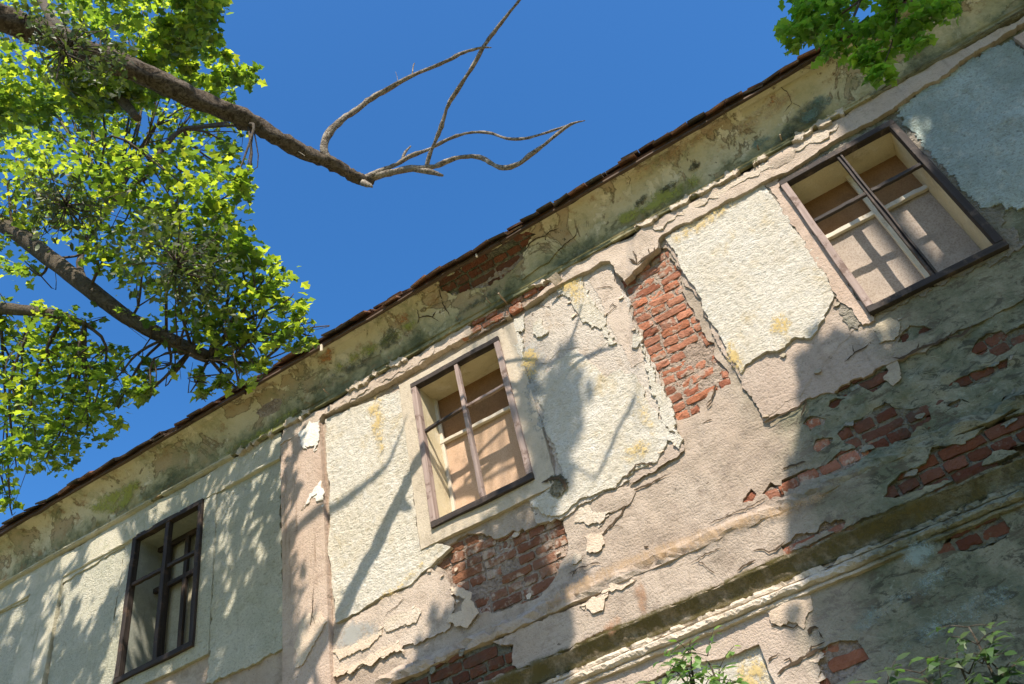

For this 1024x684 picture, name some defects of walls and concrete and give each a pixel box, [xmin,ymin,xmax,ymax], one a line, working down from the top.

leakage [781,96,830,139]
crack [525,228,578,253]
spalling [439,232,855,420]
flaking render [874,317,930,344]
spalling [949,328,1024,387]
peeling [298,420,320,452]
spalling [743,361,961,503]
spalling [885,415,1024,503]
peeling [301,480,325,509]
spalling [294,504,612,677]
spalling [405,638,516,684]
spalling [809,641,869,684]